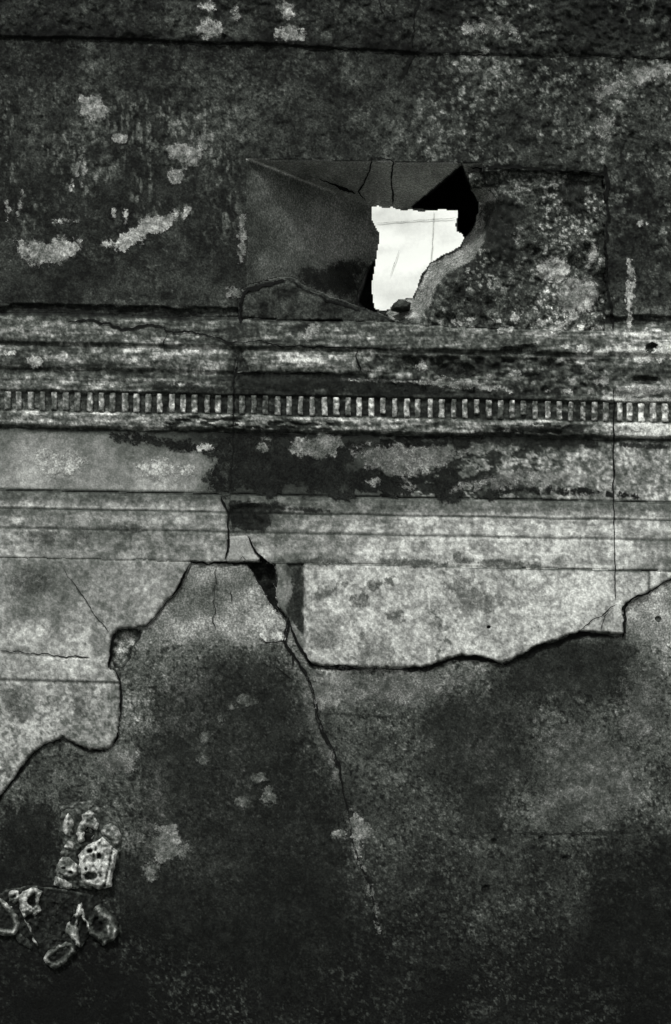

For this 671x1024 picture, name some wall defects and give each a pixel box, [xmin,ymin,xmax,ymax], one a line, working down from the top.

water stain [289,430,344,460]
water stain [497,424,584,434]
water stain [504,485,639,500]
spalling [227,503,288,621]
spalling [112,628,142,668]
water stain [313,631,474,710]
crack [261,389,671,928]
water stain [533,663,663,831]
water stain [234,773,277,808]
water stain [0,796,62,888]
water stain [140,823,189,882]
water stain [331,808,380,934]